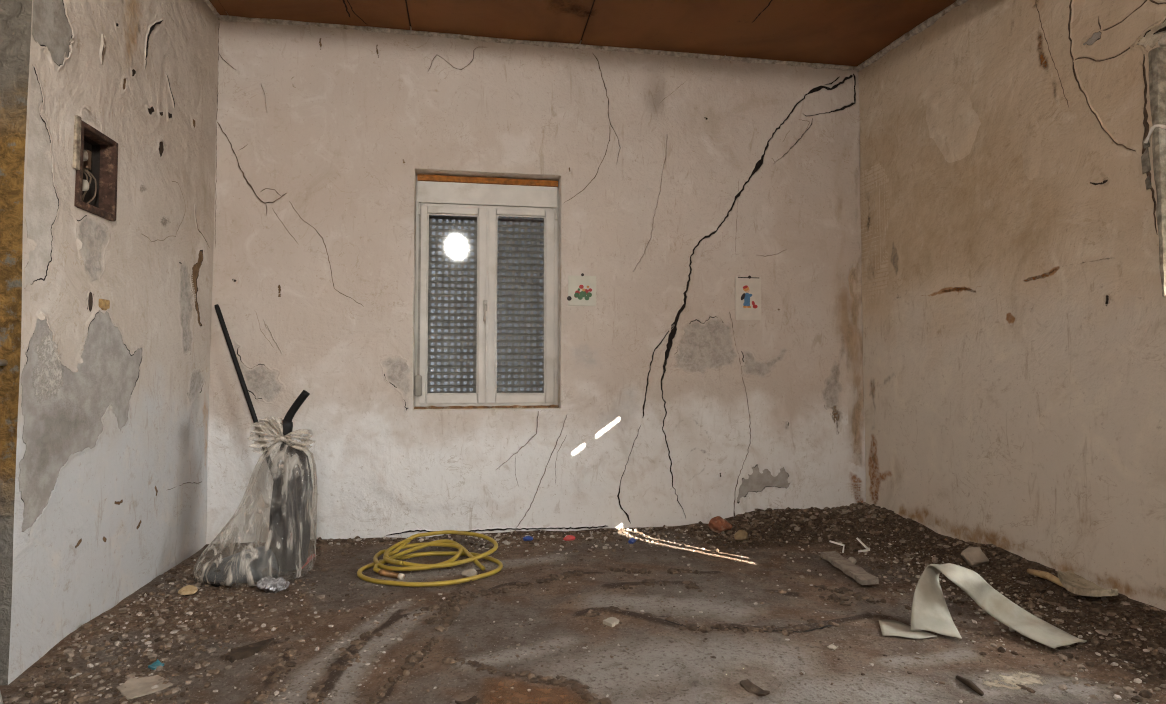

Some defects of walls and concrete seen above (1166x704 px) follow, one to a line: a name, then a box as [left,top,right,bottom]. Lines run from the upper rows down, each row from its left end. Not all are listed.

flaking render [16,0,143,543]
crack [194,23,364,307]
crack [427,46,487,72]
crack [386,53,856,536]
crack [1036,0,1166,235]
flaking render [735,462,793,507]
crack [654,615,840,633]